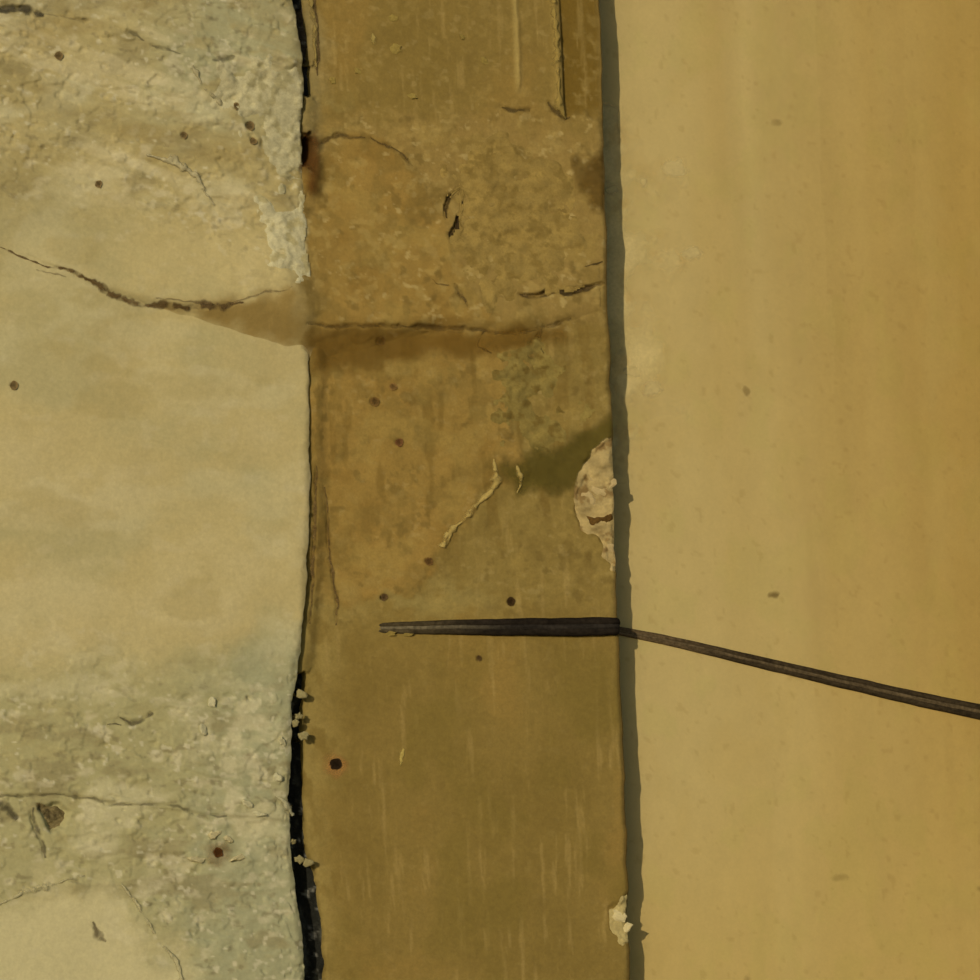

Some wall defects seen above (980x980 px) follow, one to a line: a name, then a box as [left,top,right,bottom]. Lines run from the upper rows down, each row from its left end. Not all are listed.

crack [321,133,408,160]
crack [444,188,463,236]
crack [0,247,244,311]
crack [519,261,605,297]
flaking render [603,107,661,396]
spalling [574,436,617,571]
crack [0,803,46,858]
crack [287,674,324,980]
spalling [609,895,633,946]